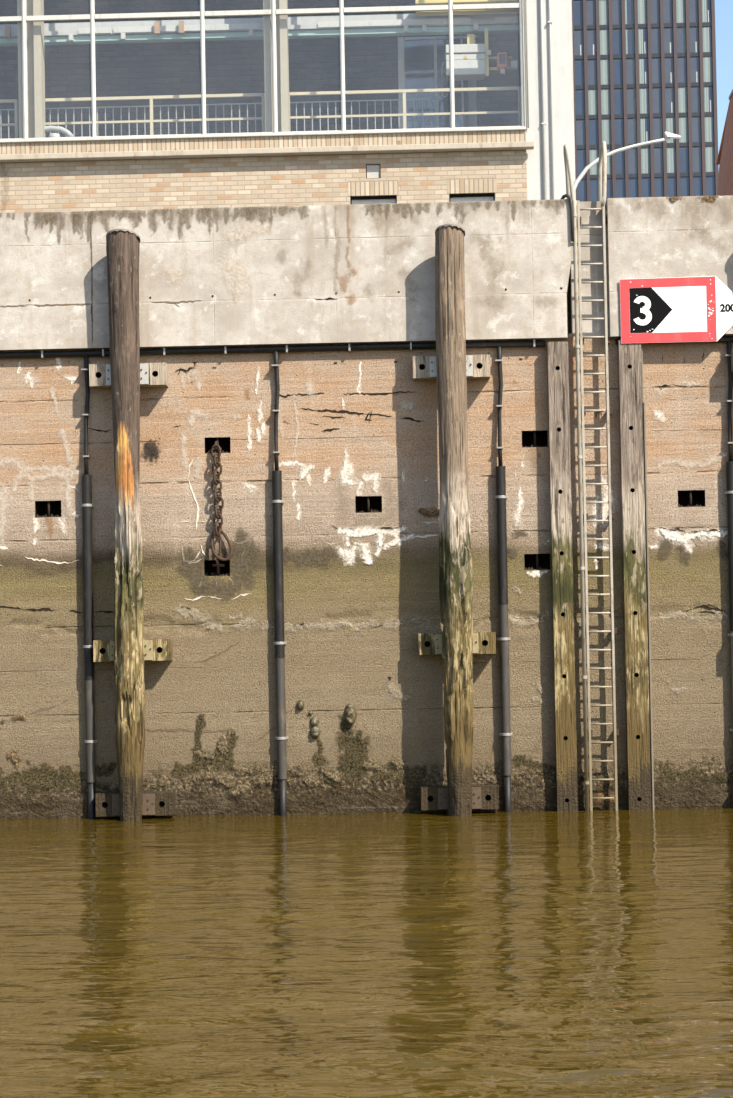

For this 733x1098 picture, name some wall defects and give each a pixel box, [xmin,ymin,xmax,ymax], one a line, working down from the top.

water stain [0,205,308,242]
water stain [234,367,282,452]
crack [279,391,421,431]
water stain [0,430,84,549]
water stain [283,525,414,568]
water stain [649,528,728,566]
water stain [171,714,239,779]
water stain [313,714,426,786]
water stain [0,762,117,795]